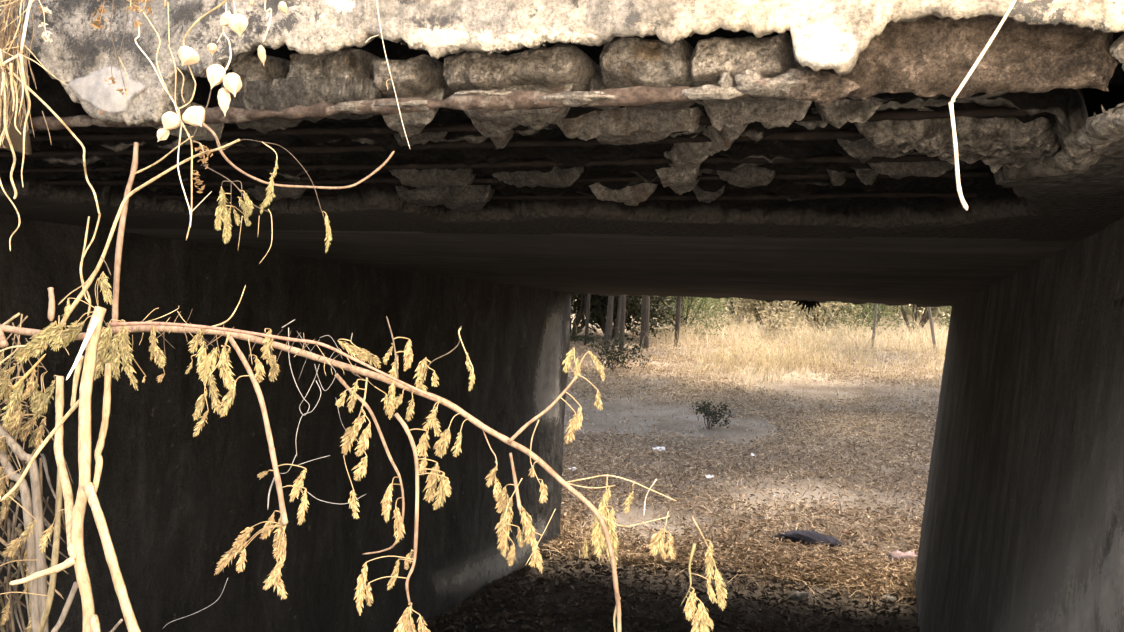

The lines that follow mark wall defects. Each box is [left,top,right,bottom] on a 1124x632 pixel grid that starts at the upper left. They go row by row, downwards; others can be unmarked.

spalling [0,15,1124,214]